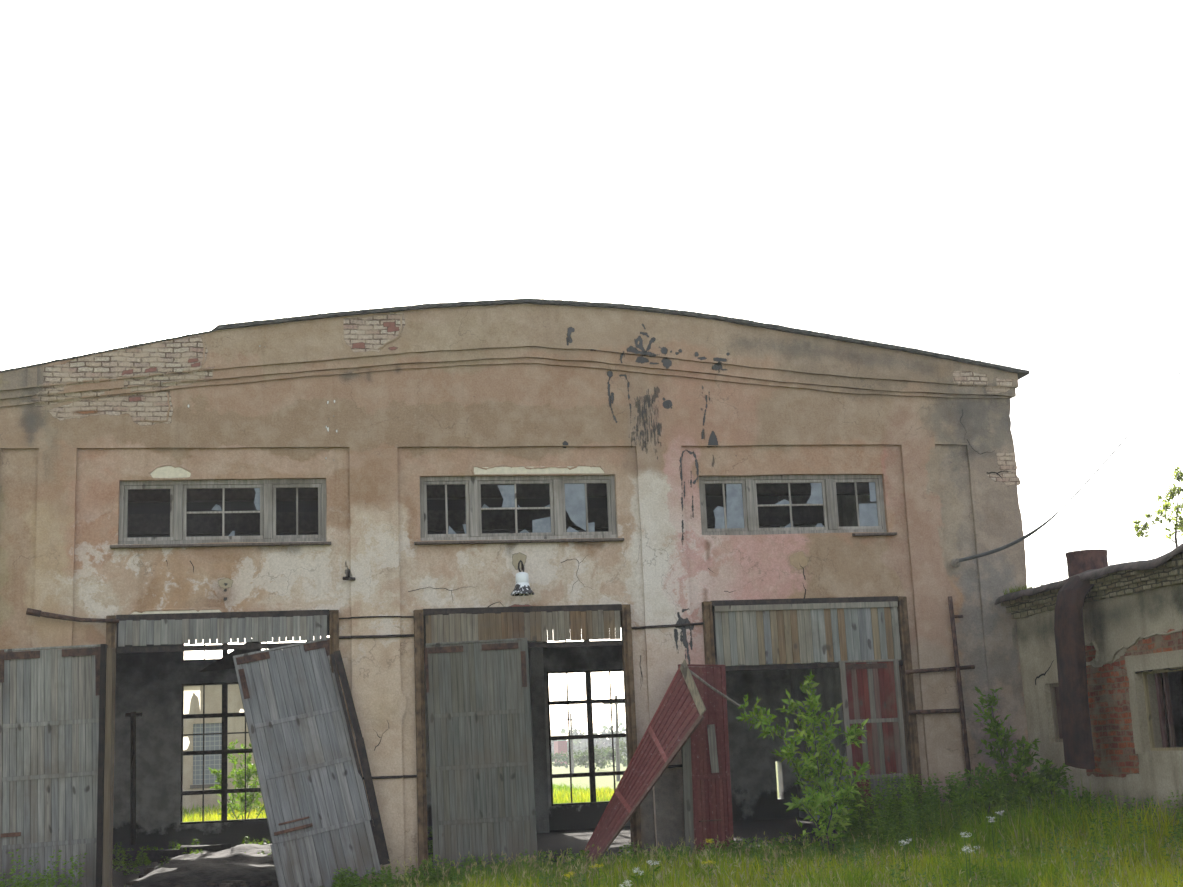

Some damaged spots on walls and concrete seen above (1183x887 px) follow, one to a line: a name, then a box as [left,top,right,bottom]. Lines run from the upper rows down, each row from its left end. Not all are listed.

spalling [343,313,405,353]
spalling [30,335,215,425]
peeling [471,463,606,475]
leakage [631,387,661,459]
crack [960,409,1011,480]
spalling [987,452,1021,486]
peeling [127,578,233,615]
spalling [1085,629,1183,778]